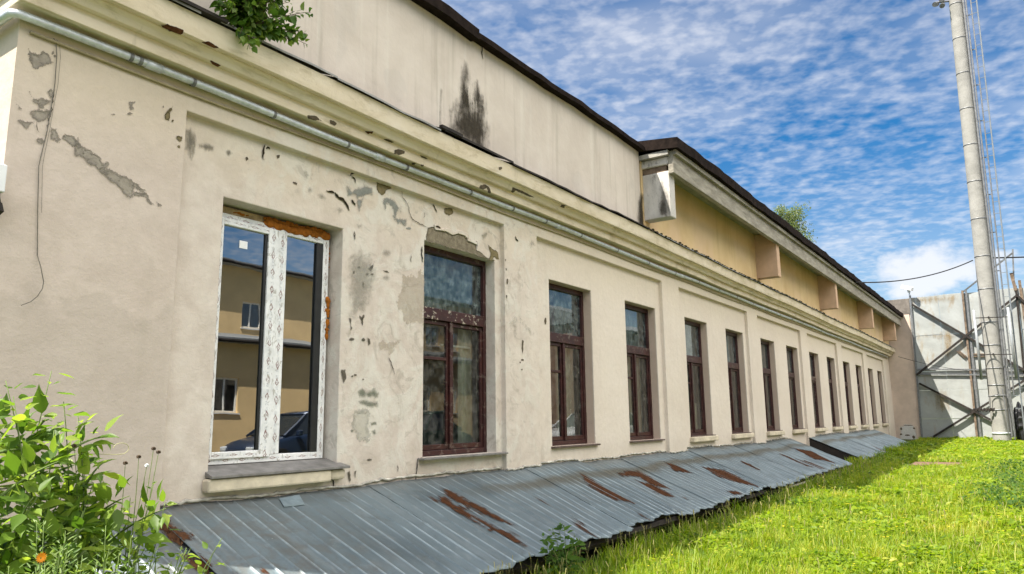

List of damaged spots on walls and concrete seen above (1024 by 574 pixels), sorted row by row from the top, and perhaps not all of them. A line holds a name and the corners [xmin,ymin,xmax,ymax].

spalling [28,51,56,69]
water stain [453,69,486,146]
spalling [16,89,162,206]
spalling [426,224,508,297]
rust [431,488,527,546]
rust [581,474,650,520]
rust [618,470,674,497]
rust [666,462,760,495]